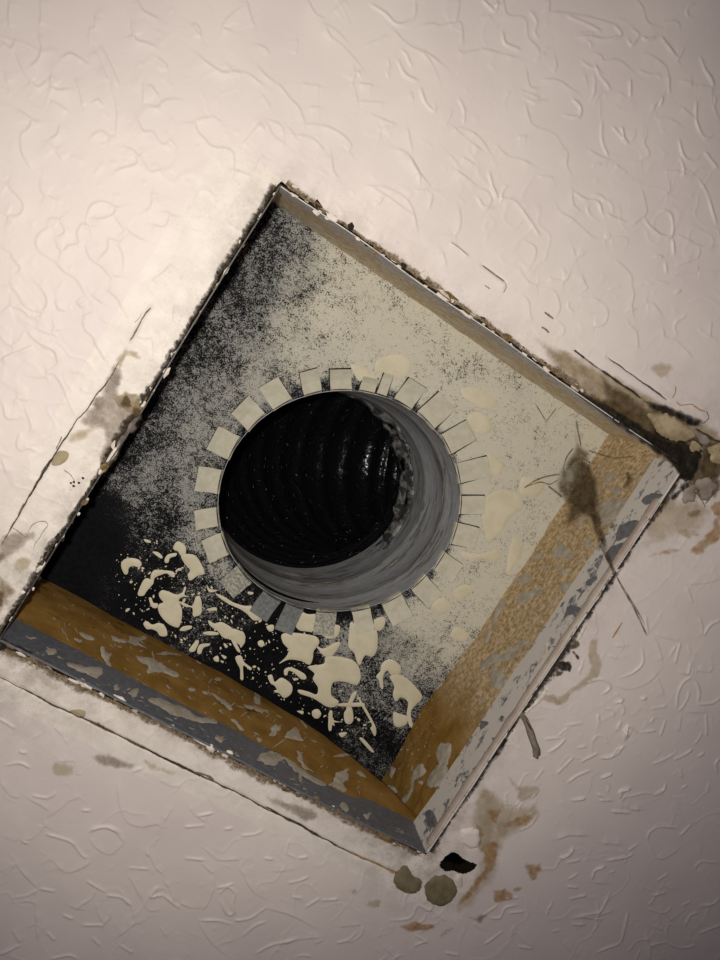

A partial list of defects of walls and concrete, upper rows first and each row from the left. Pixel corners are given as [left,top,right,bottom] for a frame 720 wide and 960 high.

crack [1,308,151,550]
water stain [72,352,142,463]
spalling [0,181,681,857]
water stain [550,352,720,499]
crack [0,677,397,874]